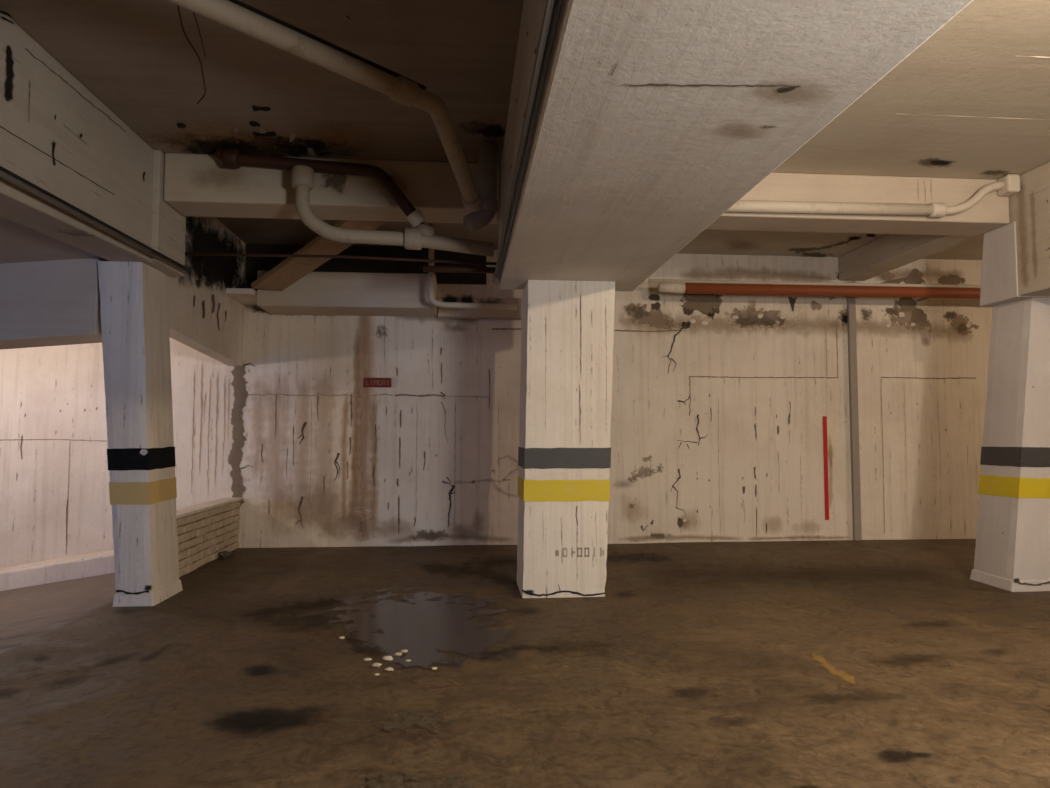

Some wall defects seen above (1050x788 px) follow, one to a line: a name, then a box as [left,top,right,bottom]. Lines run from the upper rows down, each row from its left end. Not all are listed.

peeling [878,269,965,285]
crack [661,322,691,372]
peeling [623,294,822,329]
peeling [882,297,932,332]
peeling [944,312,979,335]
spalling [228,363,256,506]
damp [373,410,410,533]
crack [671,395,708,517]
crack [442,477,456,527]